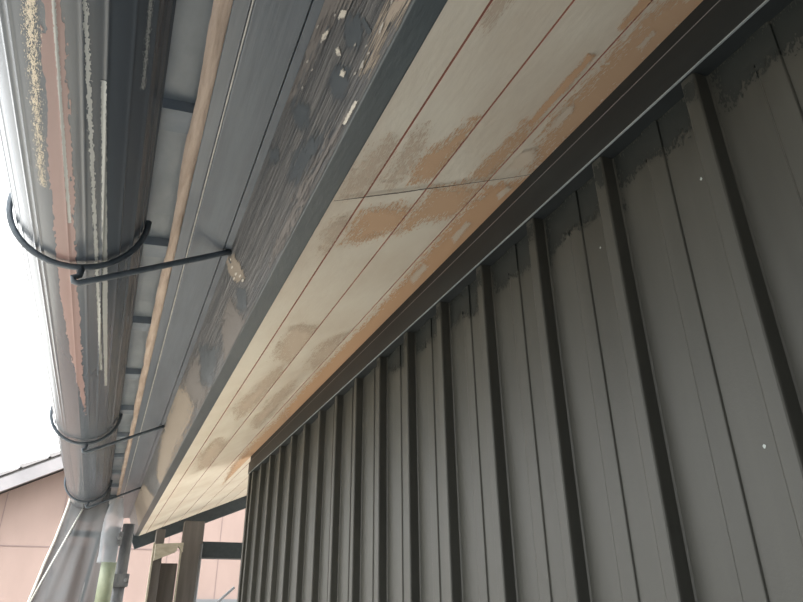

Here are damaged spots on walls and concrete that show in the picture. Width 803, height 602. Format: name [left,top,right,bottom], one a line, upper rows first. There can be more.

corrosion [40,0,86,415]
peeling [219,0,703,485]
leakage [614,79,698,210]
leakage [708,0,803,114]